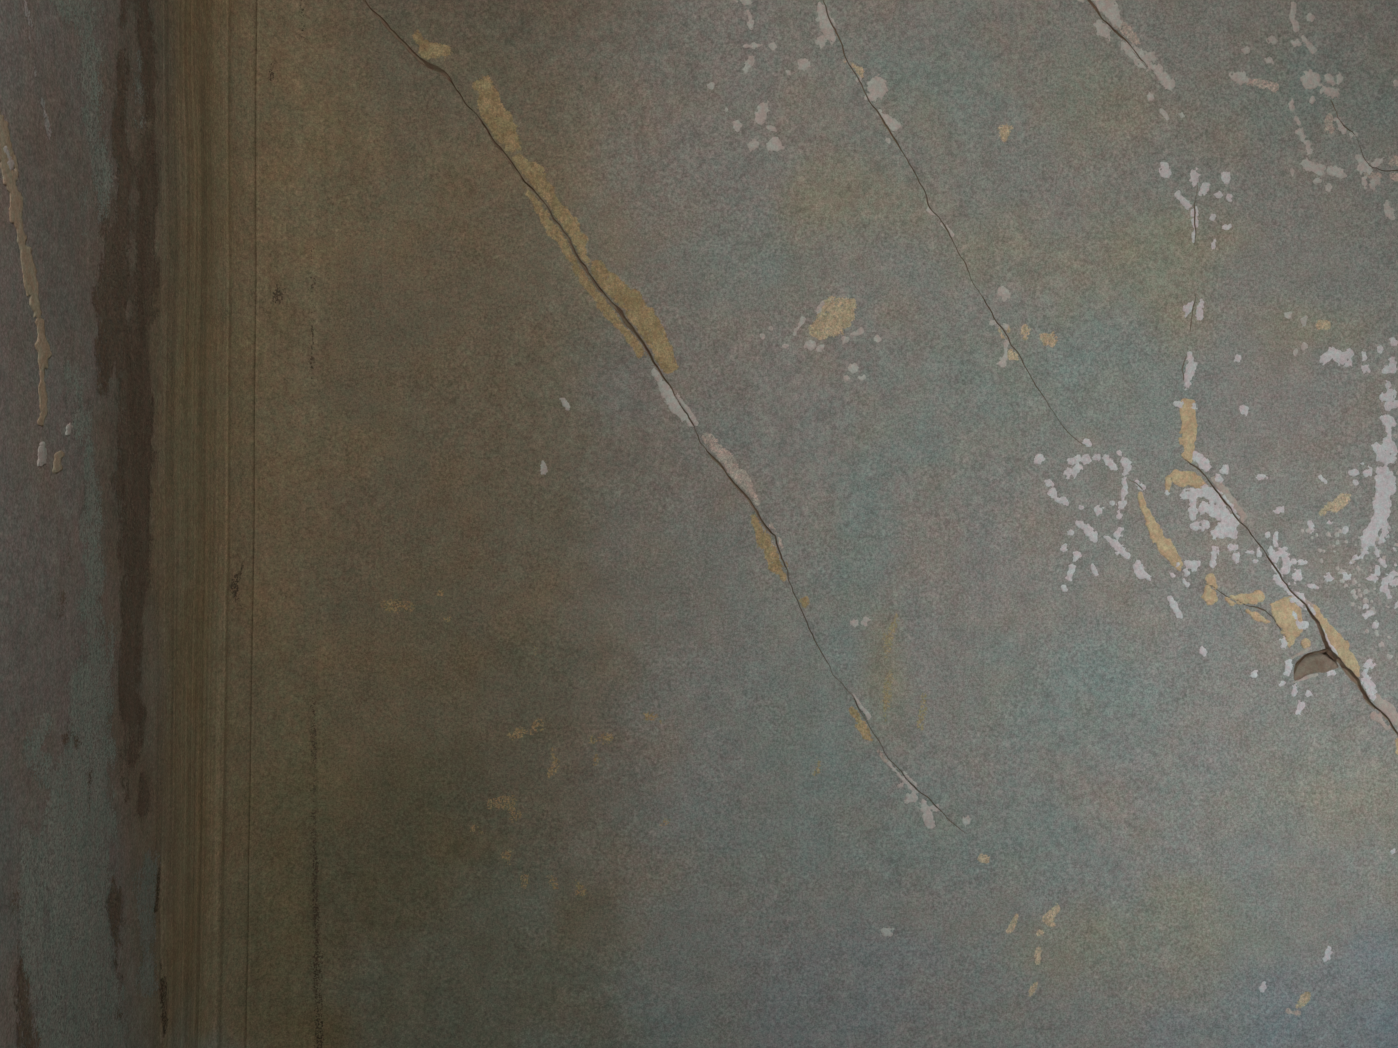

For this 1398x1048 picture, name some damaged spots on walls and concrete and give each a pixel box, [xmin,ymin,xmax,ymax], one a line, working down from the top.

crack [815,0,1080,443]
crack [1077,0,1185,120]
crack [1159,162,1232,250]
peeling [1241,2,1344,104]
crack [1234,76,1398,220]
peeling [782,296,882,352]
leakage [10,0,168,1048]
crack [363,0,971,833]
peeling [1044,438,1201,619]
crack [1165,295,1398,755]
peeling [1284,311,1398,666]
flaking render [1291,647,1338,683]